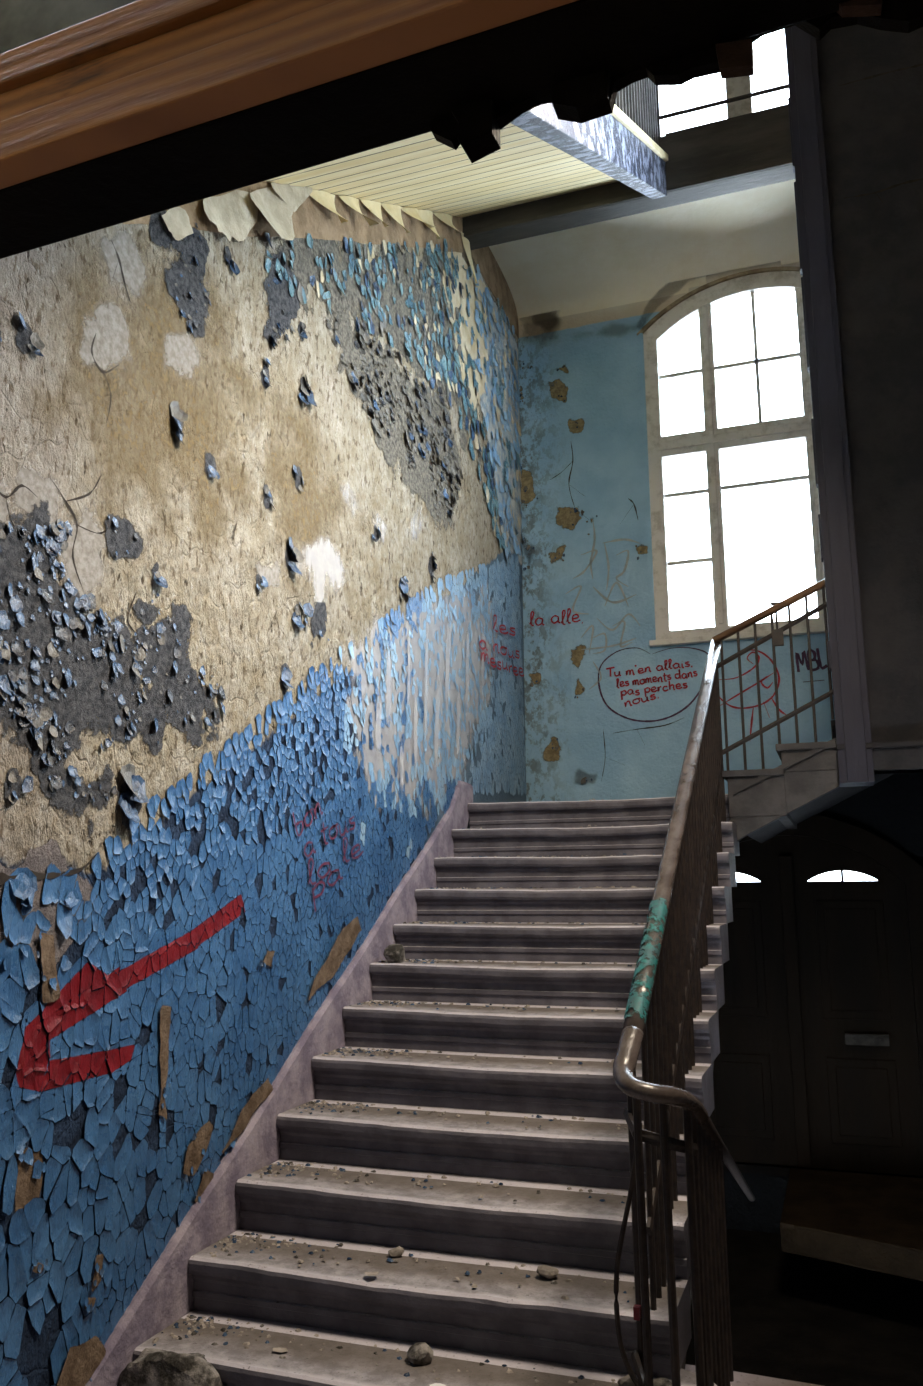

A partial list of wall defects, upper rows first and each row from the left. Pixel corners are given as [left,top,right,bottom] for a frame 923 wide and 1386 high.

crack [0,474,106,592]
peeling [0,182,597,1386]